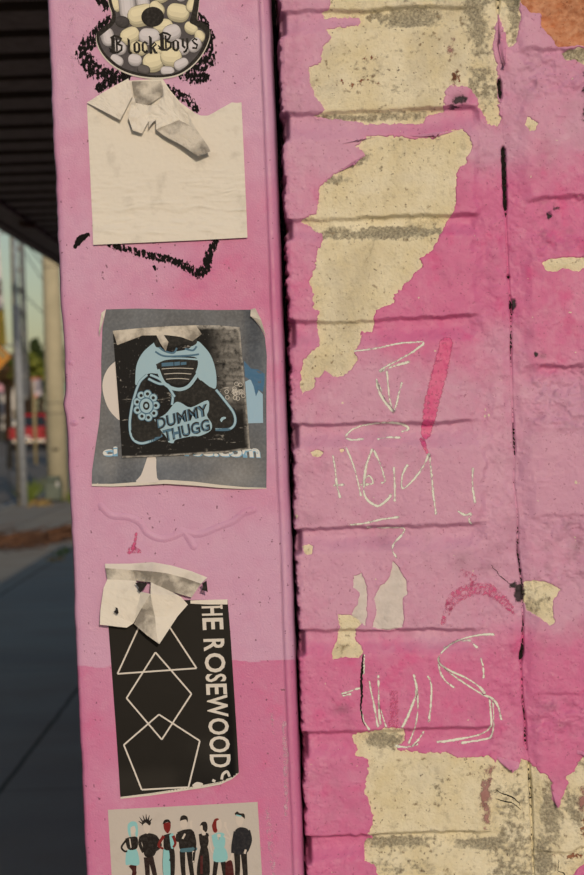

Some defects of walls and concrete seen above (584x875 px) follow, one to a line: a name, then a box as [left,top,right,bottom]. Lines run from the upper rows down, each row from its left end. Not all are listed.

crack [495,79,503,99]
peeling [300,0,584,394]
crack [500,147,508,217]
crack [505,276,513,360]
peeling [332,562,407,659]
crack [492,514,526,744]
peeling [523,580,560,626]
peeling [352,727,584,875]
crack [497,768,532,836]